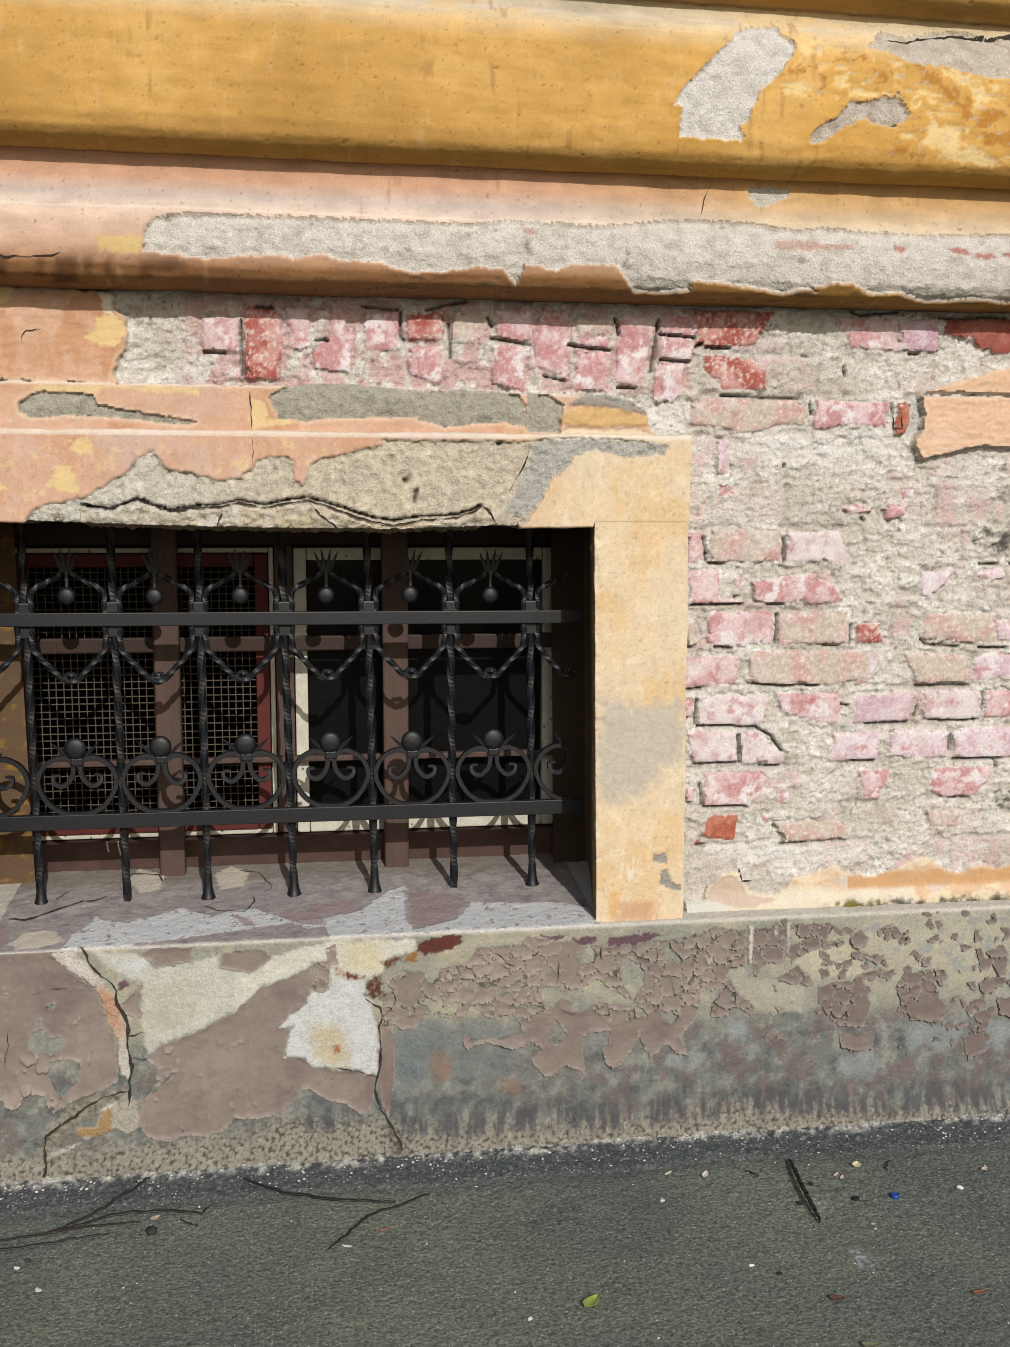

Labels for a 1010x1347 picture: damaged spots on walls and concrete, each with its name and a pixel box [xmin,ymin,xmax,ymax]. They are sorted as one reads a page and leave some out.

peeling [675,26,1010,169]
spalling [749,185,790,206]
crack [83,448,530,529]
spalling [0,211,1010,1159]
crack [8,892,107,921]
crack [43,947,149,1178]
crack [339,992,403,1150]